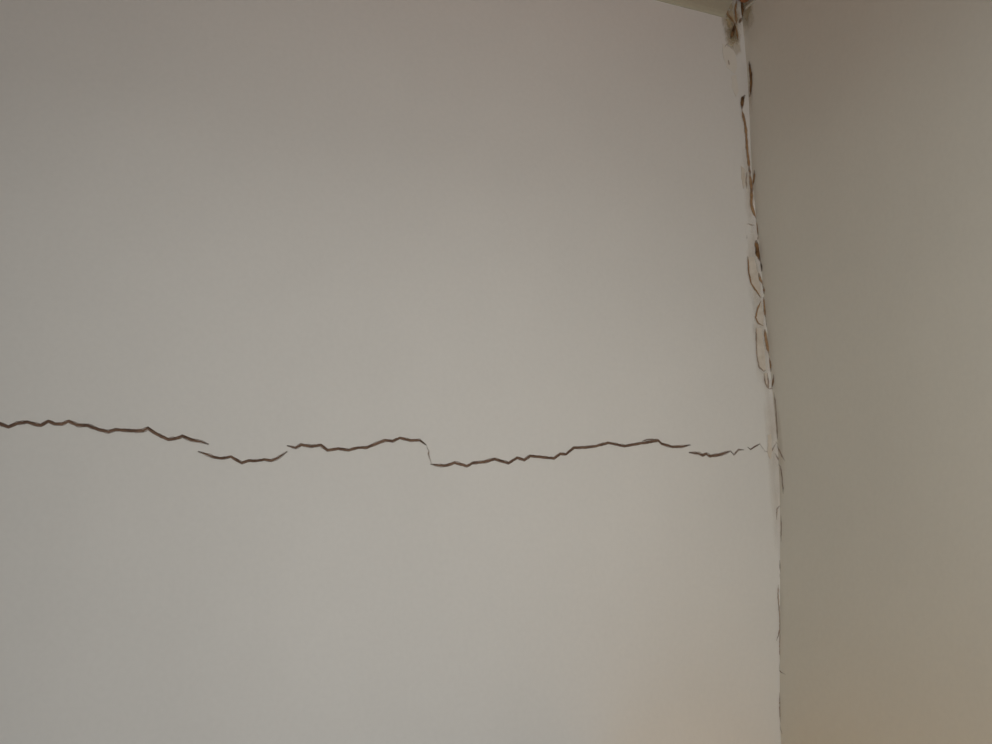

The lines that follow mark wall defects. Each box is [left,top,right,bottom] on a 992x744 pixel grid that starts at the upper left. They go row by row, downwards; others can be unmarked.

crack [727,2,744,39]
crack [0,62,784,535]
crack [776,588,784,673]